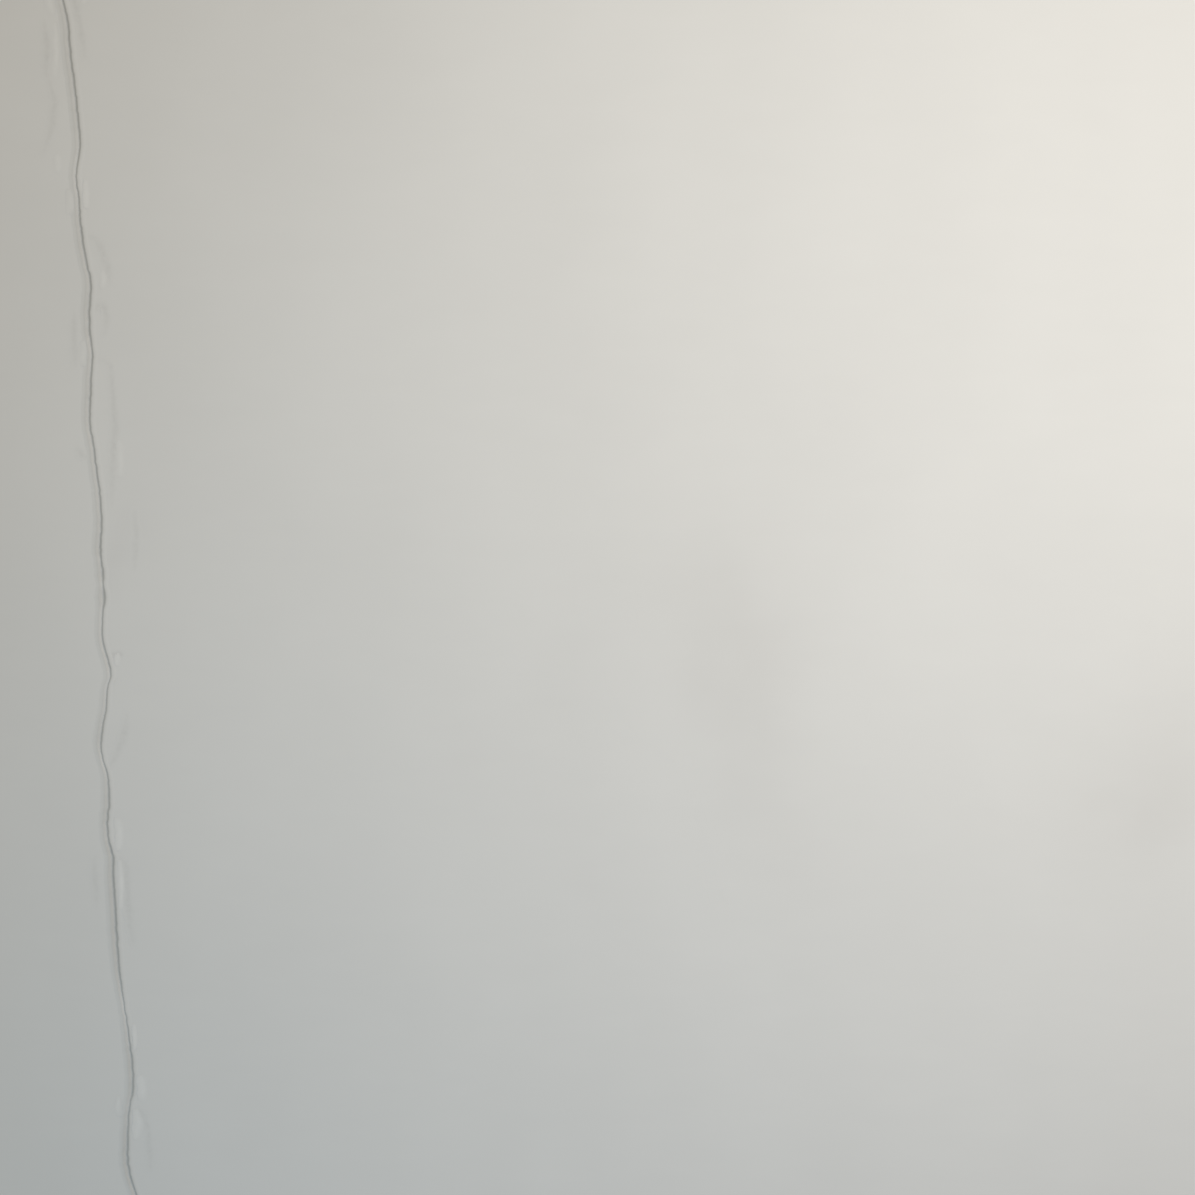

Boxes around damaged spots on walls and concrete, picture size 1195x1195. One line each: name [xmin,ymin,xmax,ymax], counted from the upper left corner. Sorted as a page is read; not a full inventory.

crack [40,0,156,1195]